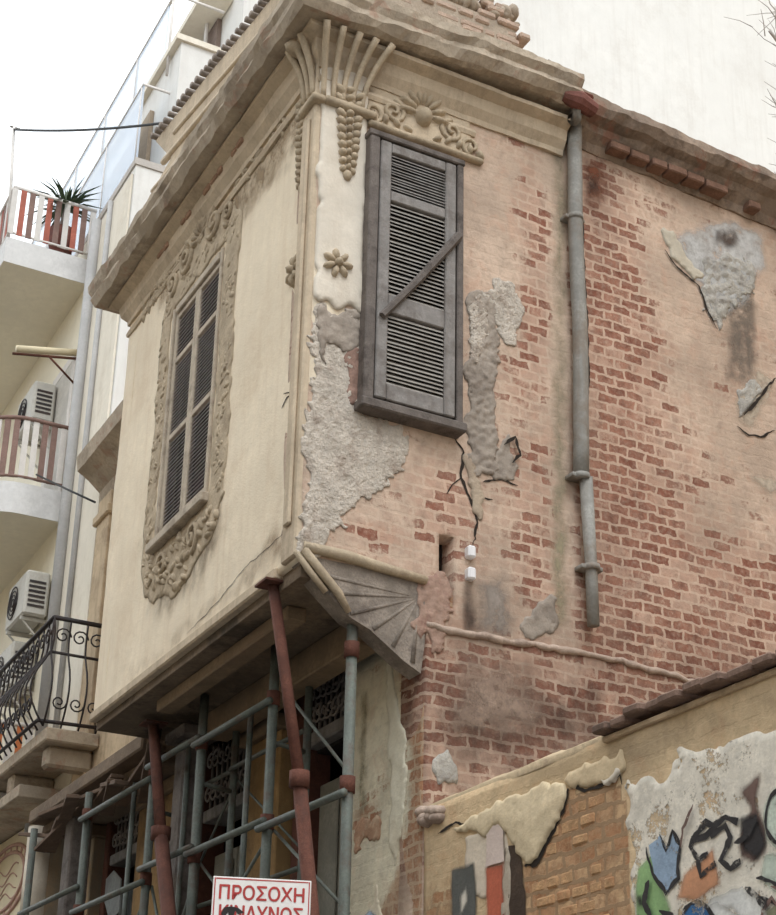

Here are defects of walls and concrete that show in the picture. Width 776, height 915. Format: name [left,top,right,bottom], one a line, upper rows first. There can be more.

flaking render [466,278,525,364]
flaking render [661,223,764,331]
water stain [730,294,754,378]
flaking render [295,301,409,558]
crack [447,439,493,543]
flaking render [483,434,522,486]
flaking render [354,662,408,866]
peeling [454,730,776,915]
flaking render [366,884,383,915]